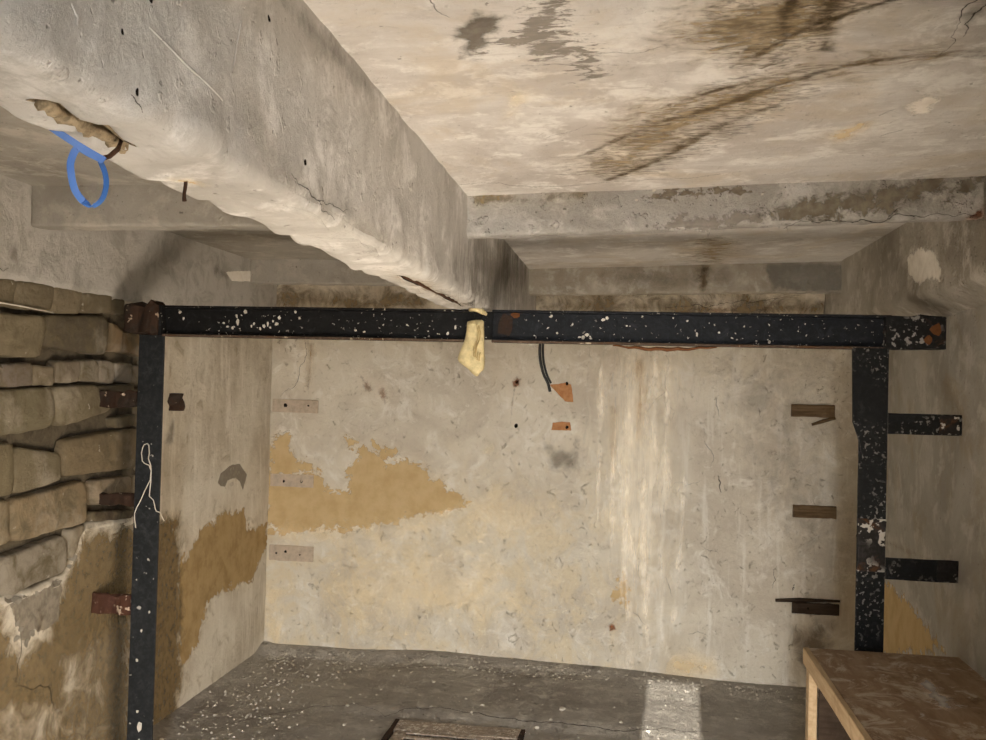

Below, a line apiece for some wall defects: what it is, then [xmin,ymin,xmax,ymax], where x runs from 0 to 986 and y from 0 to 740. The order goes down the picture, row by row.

damp [455,0,606,84]
crack [939,0,986,56]
damp [590,59,884,180]
spalling [635,186,764,202]
flaking render [908,247,941,283]
flaking render [0,279,139,712]
flaking render [153,432,472,726]
flaking render [883,581,946,656]